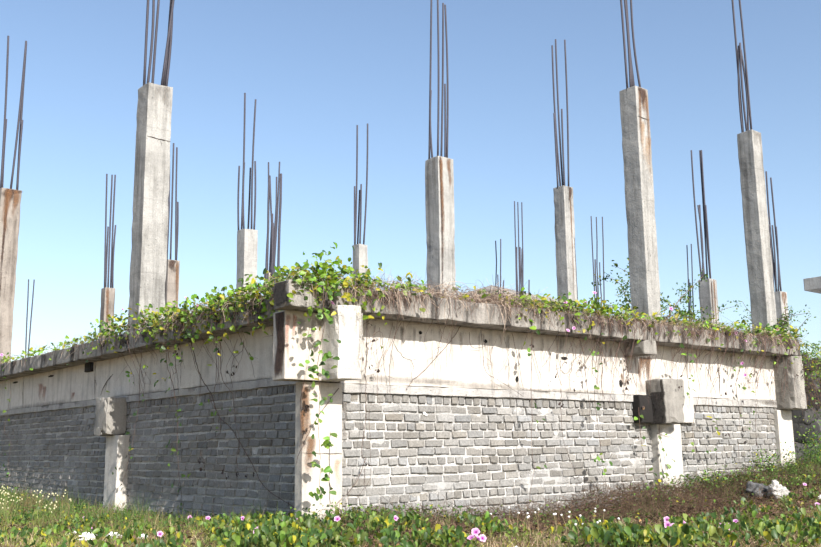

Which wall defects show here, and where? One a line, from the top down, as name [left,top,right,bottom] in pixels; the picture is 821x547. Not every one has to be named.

rust [639,87,649,131]
rust [439,157,451,293]
rust [274,312,296,374]
rust [301,387,314,460]